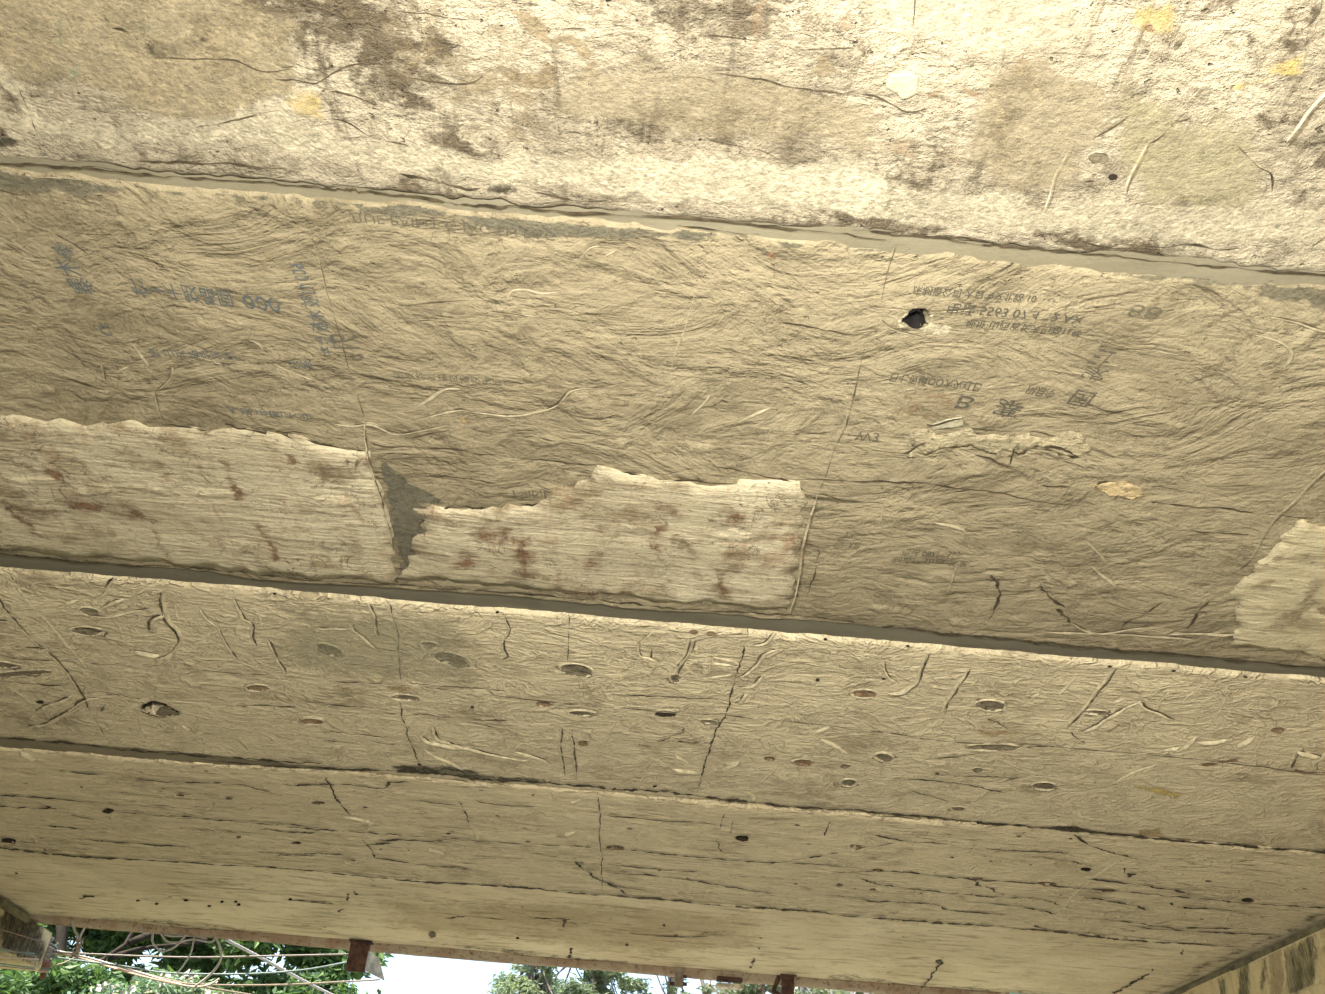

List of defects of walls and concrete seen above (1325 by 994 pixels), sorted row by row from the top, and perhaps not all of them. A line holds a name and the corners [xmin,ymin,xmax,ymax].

water stain [0,0,1325,251]
peeling [0,414,807,610]
spalling [907,417,1090,461]
spalling [1093,481,1145,500]
peeling [1228,519,1325,661]
crack [0,550,1325,994]